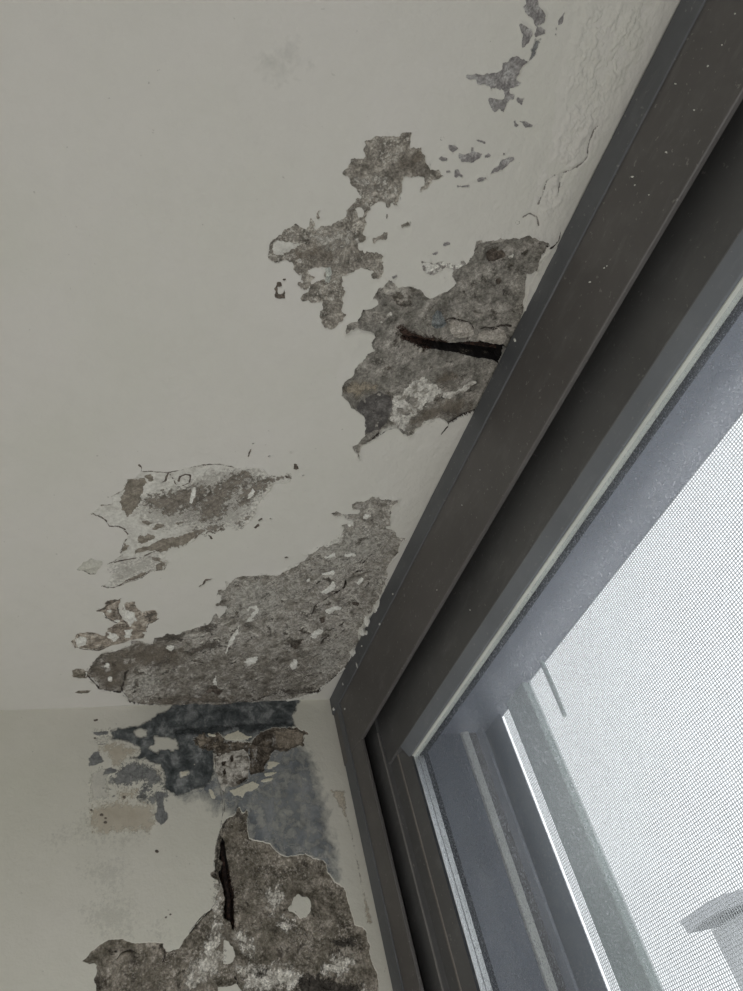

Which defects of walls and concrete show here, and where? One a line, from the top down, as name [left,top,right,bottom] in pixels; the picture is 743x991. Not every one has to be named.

peeling [466,0,564,112]
flaking render [268,132,561,457]
peeling [78,443,303,588]
flaking render [72,497,405,706]
water stain [89,700,335,875]
flaking render [83,726,378,991]